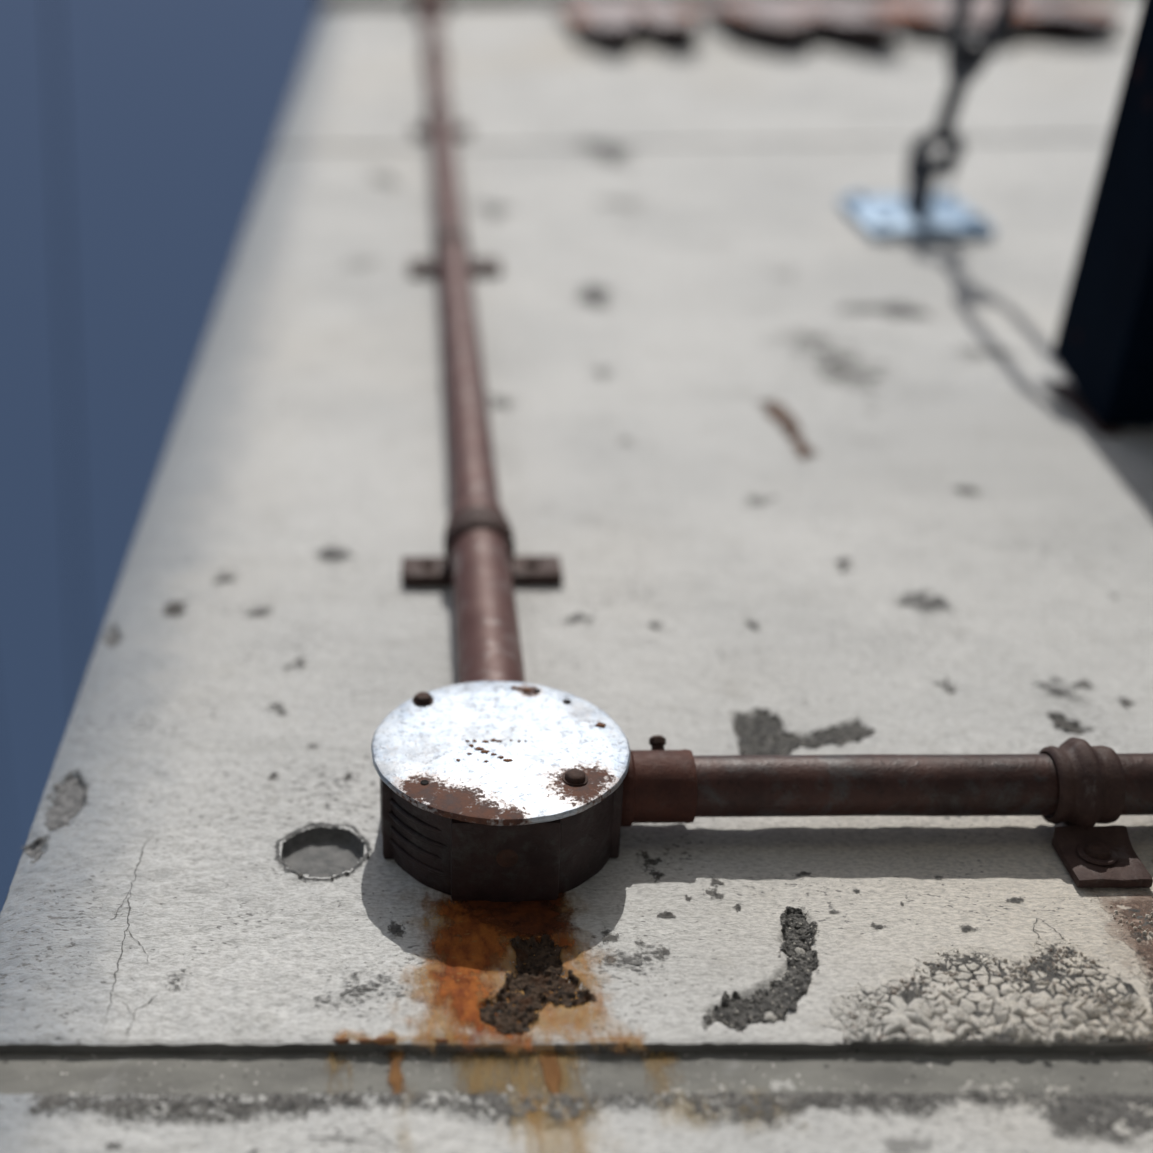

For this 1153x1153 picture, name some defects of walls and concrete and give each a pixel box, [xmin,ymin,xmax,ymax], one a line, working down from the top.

spalling [733,708,875,755]
crack [102,838,163,1035]
rust [414,892,630,1123]
spalling [479,934,597,1036]
peeling [586,929,678,976]
peeling [685,878,725,901]
spalling [702,906,819,1031]
peeling [807,815,1153,1047]
rust [329,1031,404,1095]